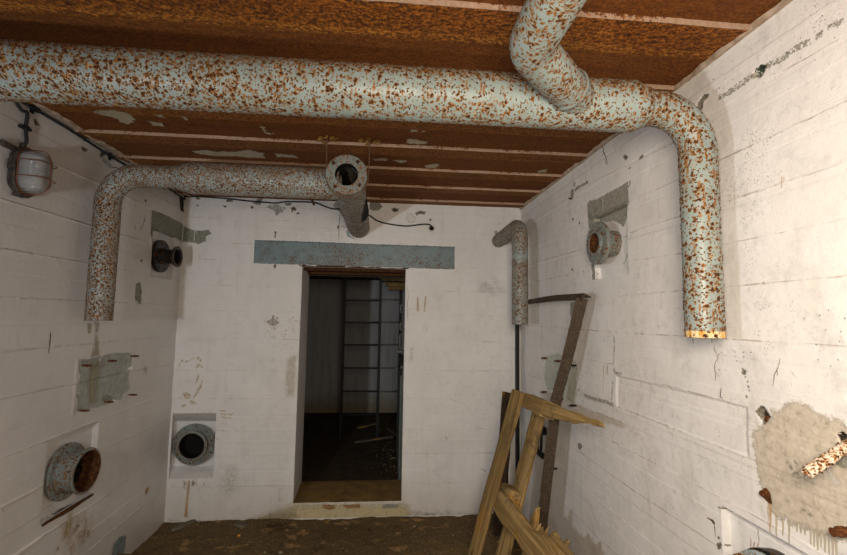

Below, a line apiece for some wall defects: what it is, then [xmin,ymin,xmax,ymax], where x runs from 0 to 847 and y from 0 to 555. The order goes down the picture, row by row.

peeling [92,110,135,124]
peeling [192,150,265,158]
peeling [151,210,211,244]
spalling [756,406,770,424]